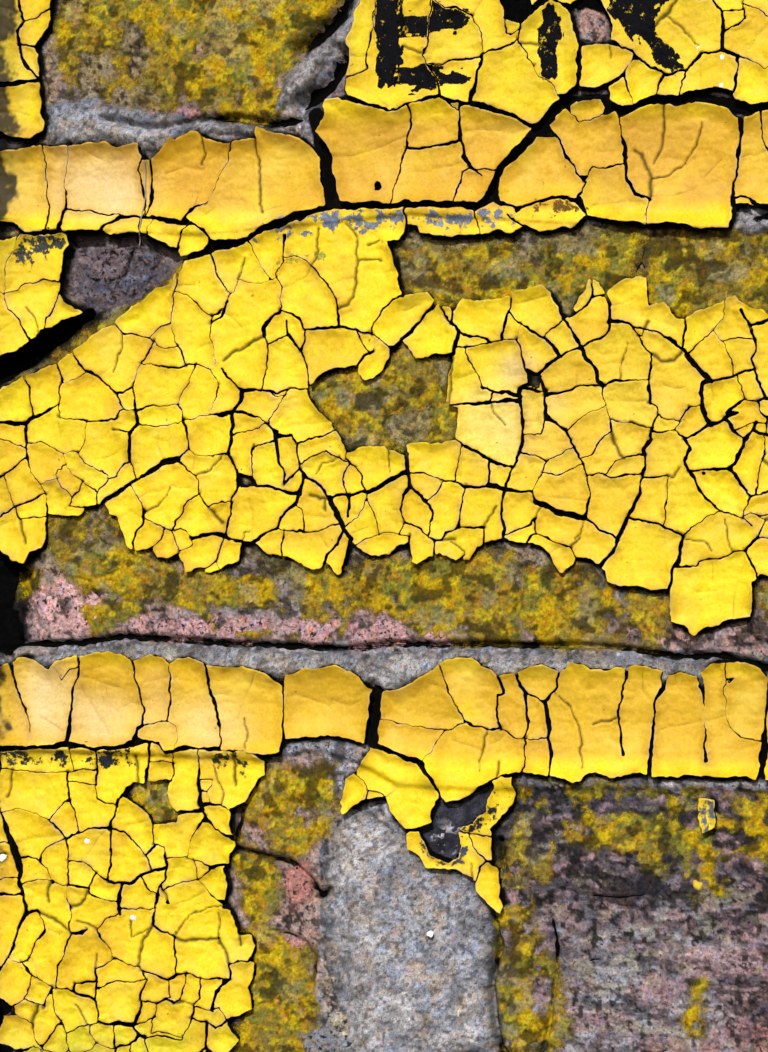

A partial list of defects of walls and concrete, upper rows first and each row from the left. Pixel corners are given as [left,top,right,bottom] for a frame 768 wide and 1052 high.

crack [0,0,768,583]
peeling [0,0,768,636]
crack [0,633,768,898]
crack [0,808,41,960]
crack [52,803,176,937]
crack [103,959,235,1052]
crack [280,931,318,980]
peeling [0,651,768,1052]
crack [593,892,645,900]